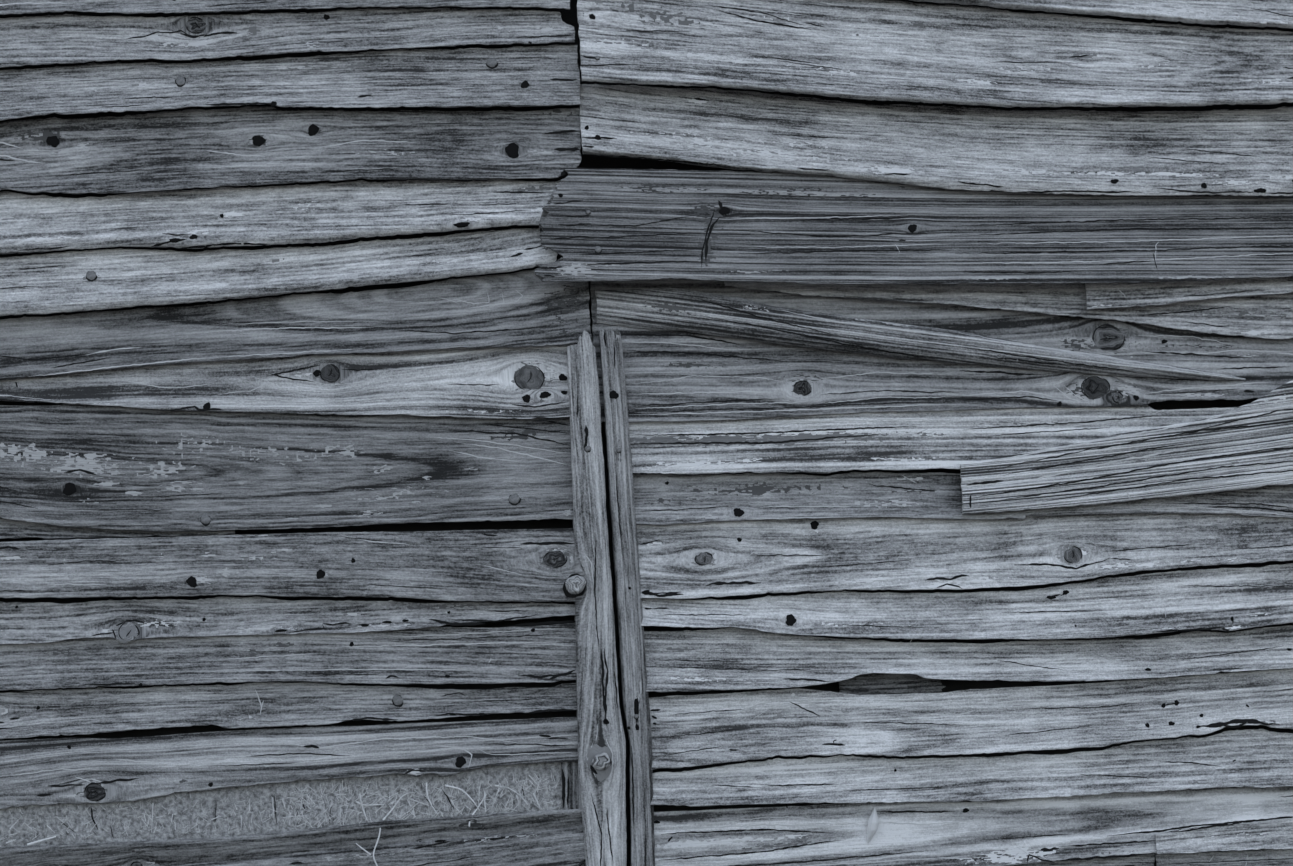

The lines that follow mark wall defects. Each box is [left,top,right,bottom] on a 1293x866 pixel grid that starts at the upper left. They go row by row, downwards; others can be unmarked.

crack [328,166,400,174]
crack [402,130,1293,277]
crack [310,672,399,680]